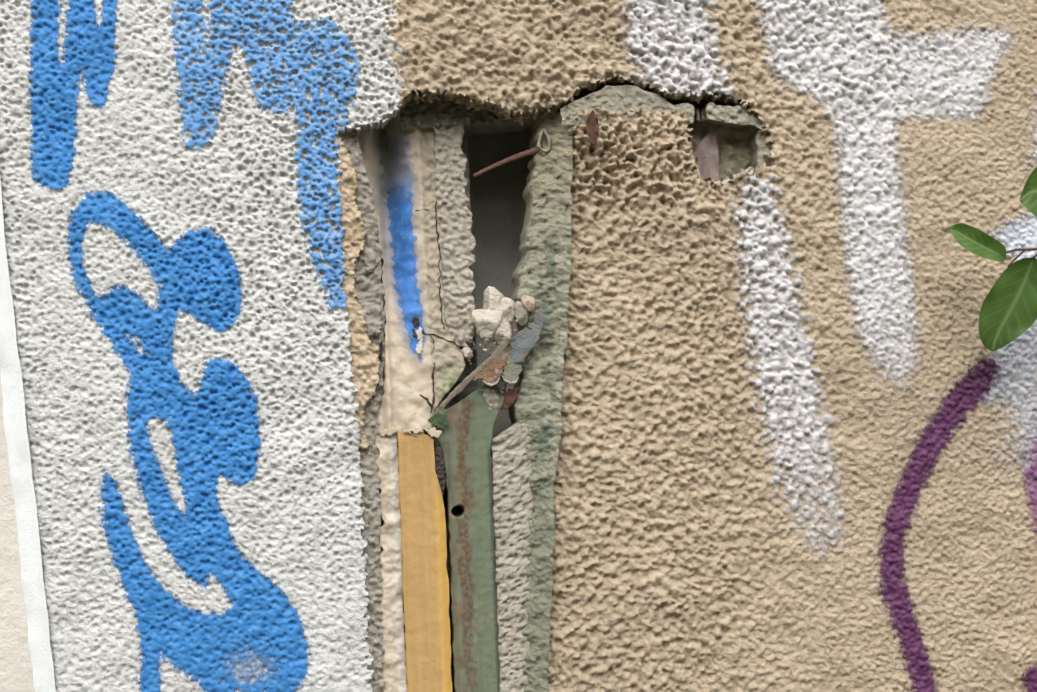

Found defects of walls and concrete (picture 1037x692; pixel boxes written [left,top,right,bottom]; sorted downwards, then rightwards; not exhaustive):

flaking render [332,137,383,449]
spalling [399,96,540,310]
spalling [687,102,772,181]
peeling [379,306,545,497]